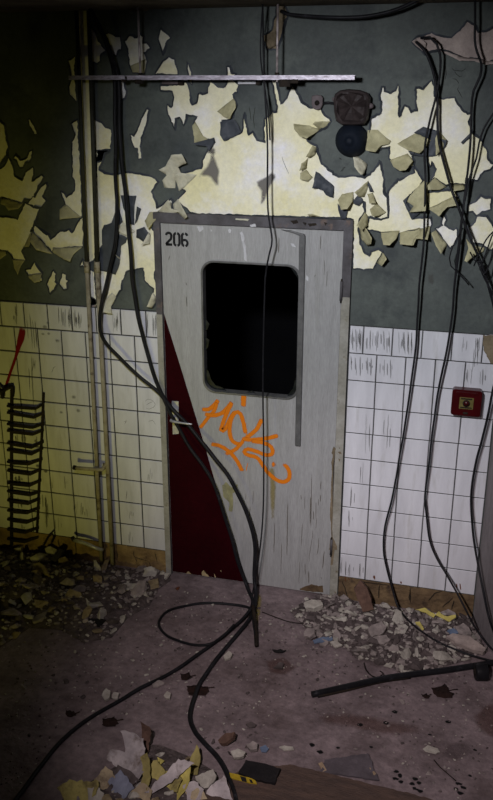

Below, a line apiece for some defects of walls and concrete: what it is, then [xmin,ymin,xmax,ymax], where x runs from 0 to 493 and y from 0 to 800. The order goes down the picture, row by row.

peeling [0,6,493,314]